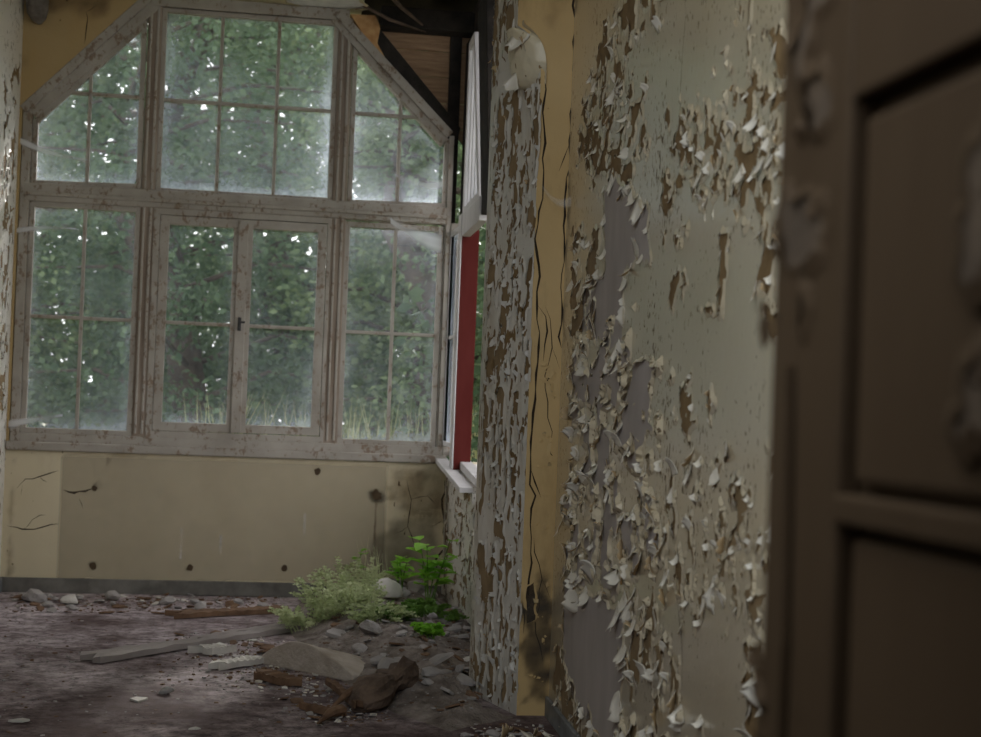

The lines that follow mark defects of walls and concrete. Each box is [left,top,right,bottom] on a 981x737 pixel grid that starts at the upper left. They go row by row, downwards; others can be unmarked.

flaking render [285,0,384,56]
peeling [0,51,21,491]
crack [10,515,54,530]
crack [21,471,91,507]
peeling [443,0,542,708]
crack [523,84,571,633]
peeling [552,0,841,737]